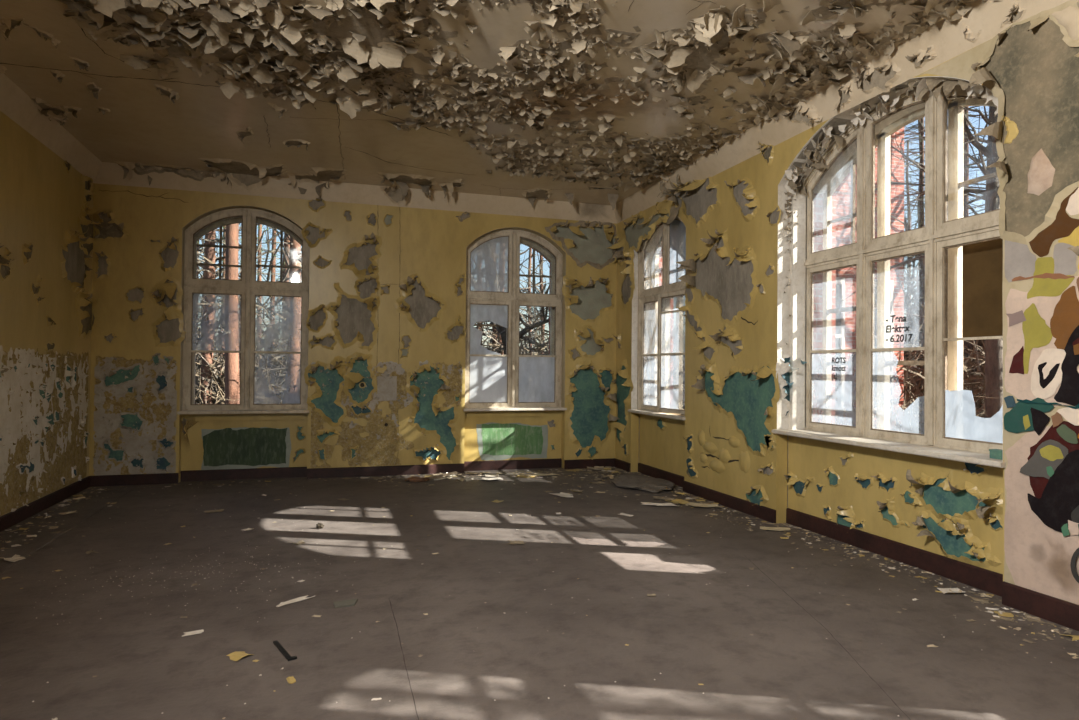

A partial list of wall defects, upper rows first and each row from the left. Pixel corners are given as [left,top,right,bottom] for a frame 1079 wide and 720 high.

peeling [0,160,189,516]
peeling [57,0,1079,568]